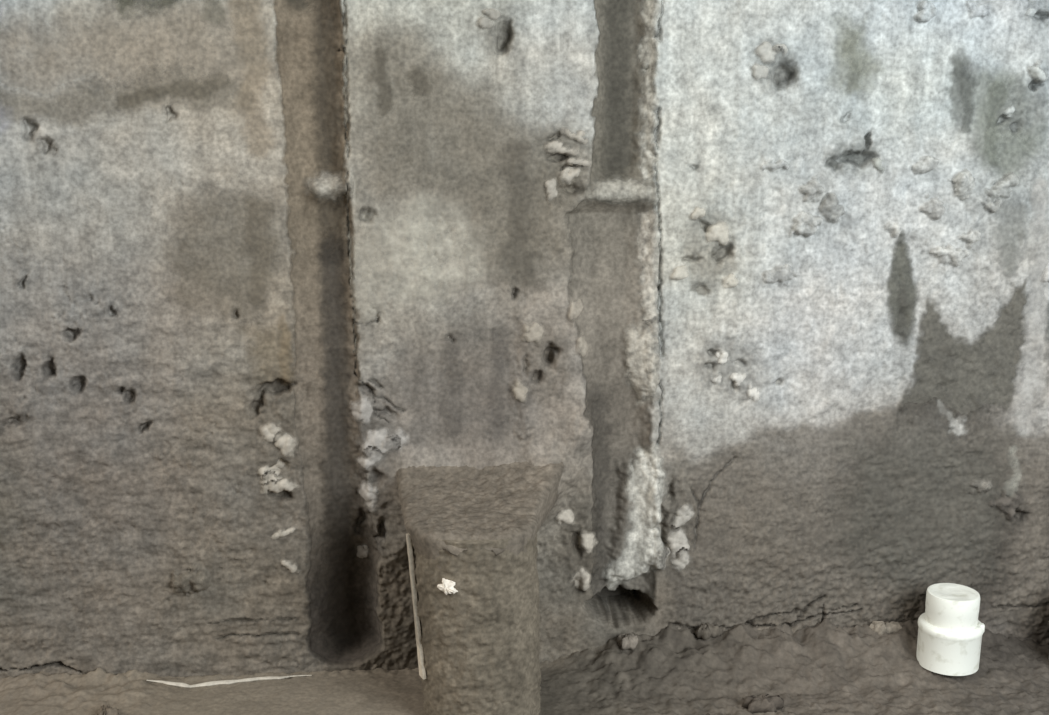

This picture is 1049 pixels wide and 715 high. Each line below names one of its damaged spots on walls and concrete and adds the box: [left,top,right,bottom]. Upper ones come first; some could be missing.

flaking render [545,129,590,200]
flaking render [251,379,291,413]
flaking render [259,423,298,498]
flaking render [351,384,408,530]
damp [671,234,1049,621]
flaking render [272,528,295,539]
flaking render [281,561,297,573]
flaking render [357,520,386,559]
flaking render [651,482,694,570]
crack [691,459,733,548]